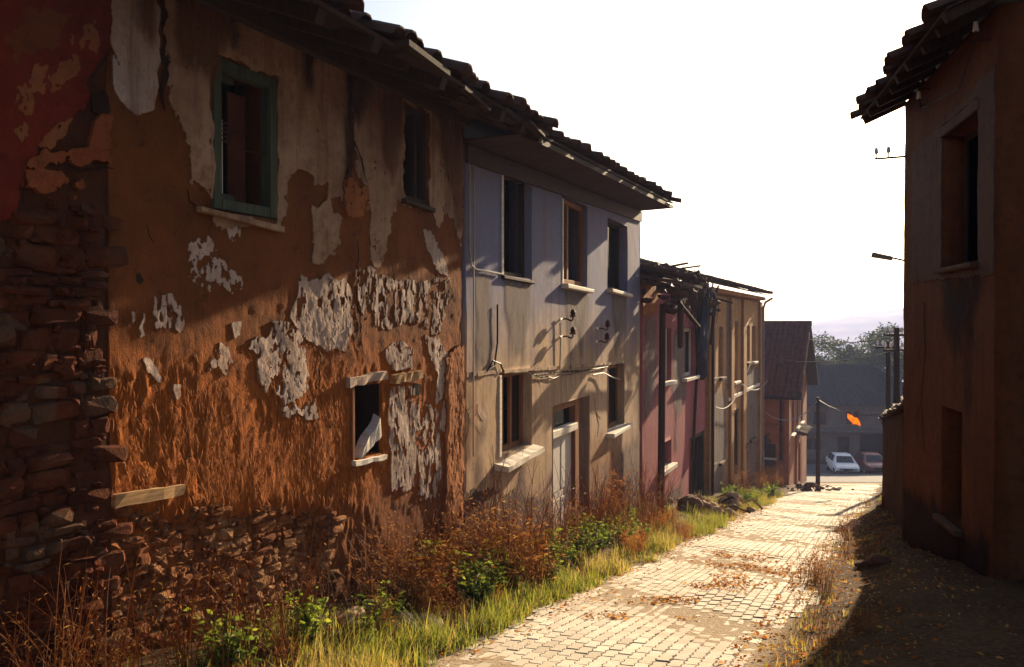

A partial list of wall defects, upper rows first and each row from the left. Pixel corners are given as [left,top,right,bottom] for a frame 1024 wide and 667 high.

peeling [0,0,216,222]
crack [159,0,170,111]
peeling [131,293,185,337]
peeling [187,214,254,294]
peeling [219,17,549,536]